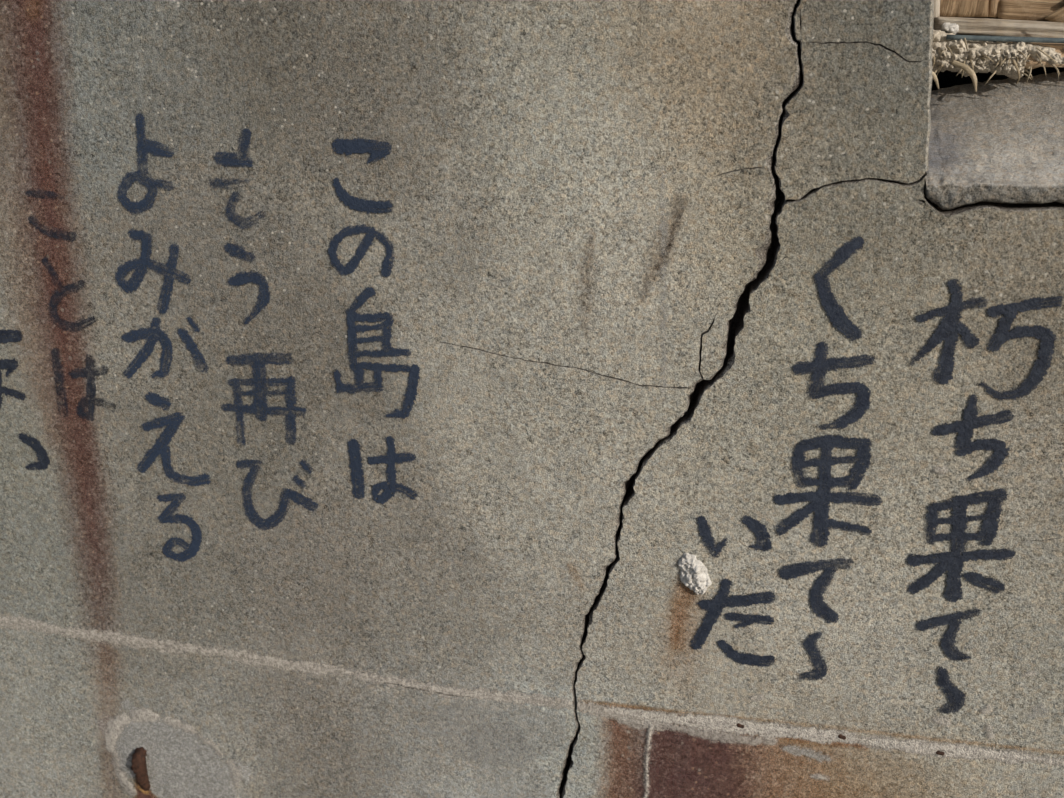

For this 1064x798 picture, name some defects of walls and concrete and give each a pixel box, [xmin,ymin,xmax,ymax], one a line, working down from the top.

corrosion [5,0,106,610]
crack [435,0,1064,798]
corrosion [135,782,153,798]
corrosion [586,703,816,798]